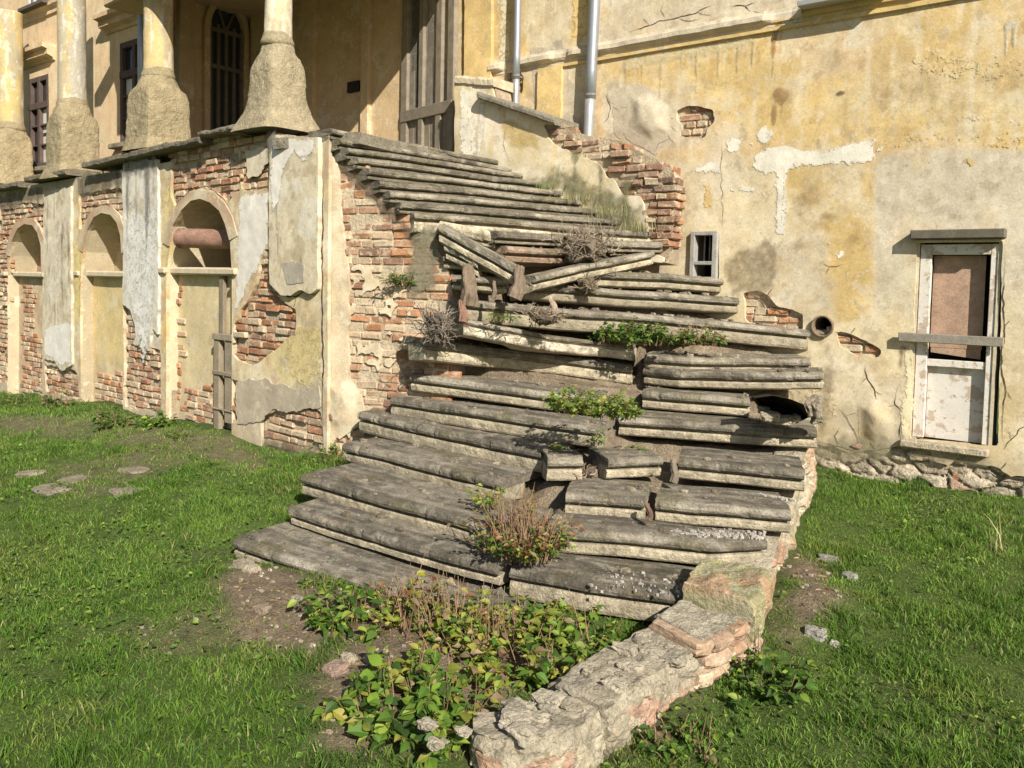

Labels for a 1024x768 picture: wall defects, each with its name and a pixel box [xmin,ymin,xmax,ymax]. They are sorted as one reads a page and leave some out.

crack [629,3,772,32]
flaking render [497,0,680,253]
flaking render [678,106,715,139]
peeling [726,116,1024,243]
flaking render [0,132,333,457]
flaking render [744,291,803,329]
flaking render [827,326,881,358]
crack [822,328,906,452]
flaking render [815,343,1024,498]